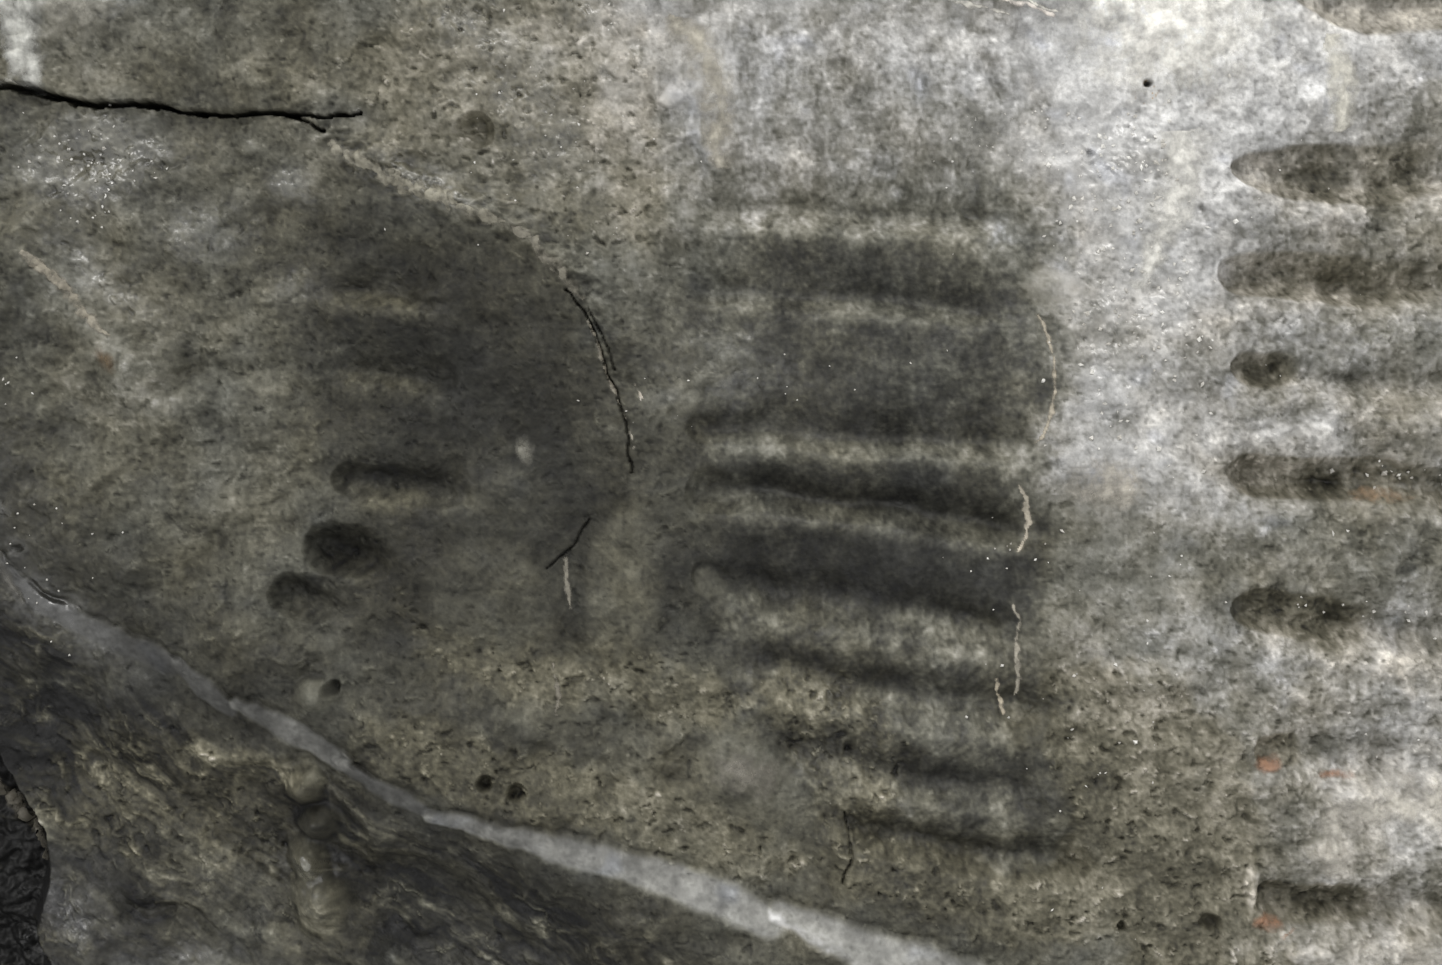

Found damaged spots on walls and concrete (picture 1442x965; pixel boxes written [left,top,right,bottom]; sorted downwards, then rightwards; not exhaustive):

crack [0,78,364,133]
crack [566,289,643,474]